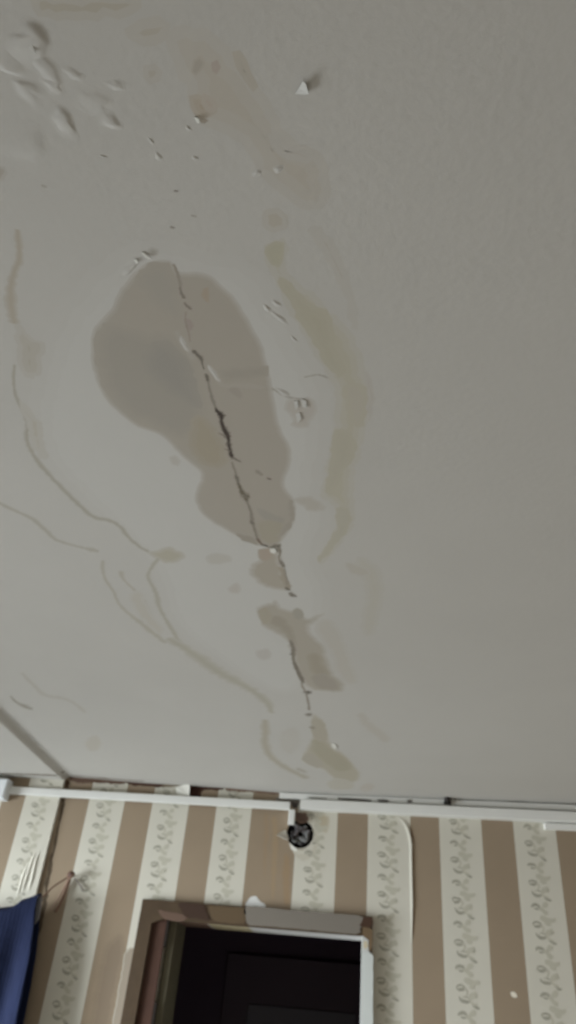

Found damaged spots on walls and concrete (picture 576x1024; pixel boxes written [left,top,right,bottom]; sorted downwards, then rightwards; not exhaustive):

peeling [296,81,309,95]
water stain [0,229,376,790]
crack [172,264,297,597]
crack [289,640,315,729]